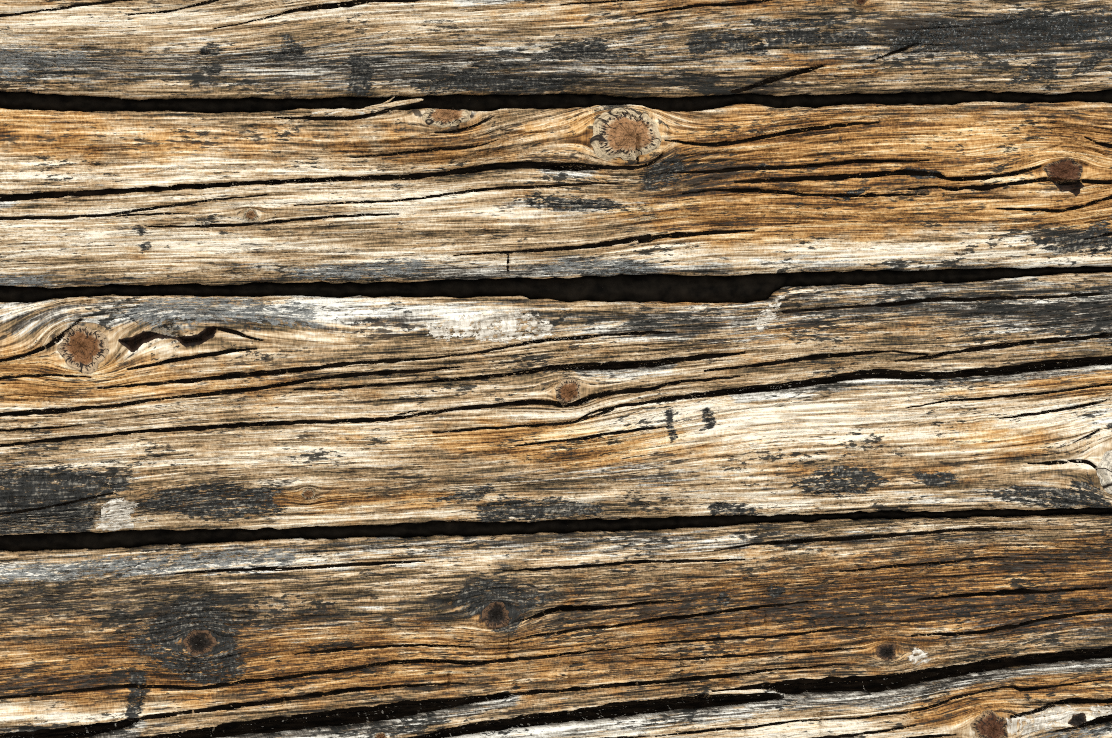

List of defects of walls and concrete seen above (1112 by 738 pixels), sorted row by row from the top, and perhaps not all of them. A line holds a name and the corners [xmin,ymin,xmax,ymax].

crack [783,293,1100,314]
crack [0,318,1112,469]
crack [0,493,114,515]
crack [176,561,425,574]
crack [503,527,1031,572]
crack [0,587,1112,738]